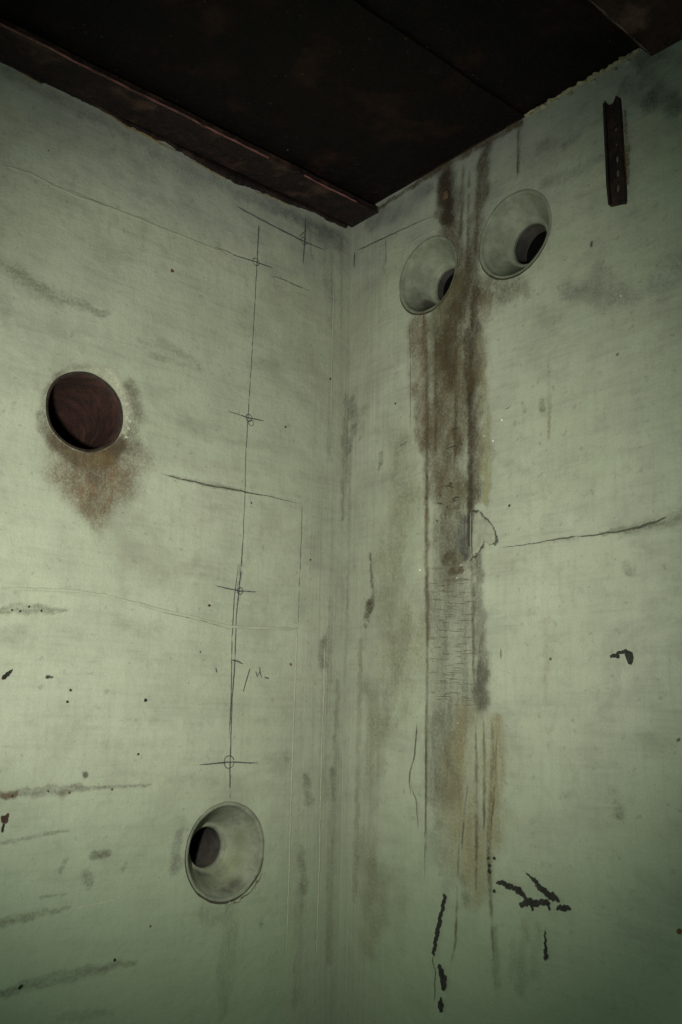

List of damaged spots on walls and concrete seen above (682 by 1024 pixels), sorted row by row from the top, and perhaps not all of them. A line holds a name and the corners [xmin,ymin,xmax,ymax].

corrosion [50,433,131,519]
crack [508,517,665,547]